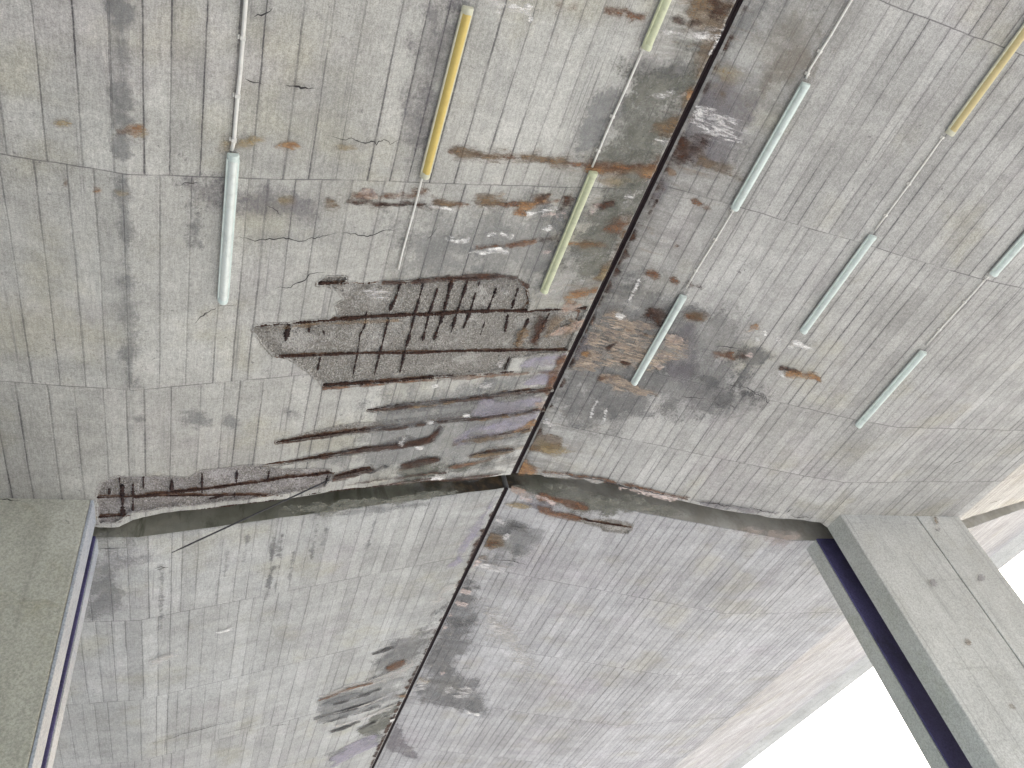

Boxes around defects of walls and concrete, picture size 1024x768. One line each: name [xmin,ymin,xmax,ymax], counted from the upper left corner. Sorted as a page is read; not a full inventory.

crack [236,205,396,242]
crack [335,137,396,146]
corrosion [326,189,575,216]
spalling [250,275,687,391]
corrosion [318,216,711,507]
leakage [283,29,814,517]
corrosion [449,0,747,214]
corrosion [779,366,821,382]
spalling [94,387,554,525]
corrosion [453,487,589,595]
corrosion [370,618,442,768]
leakage [314,506,528,767]